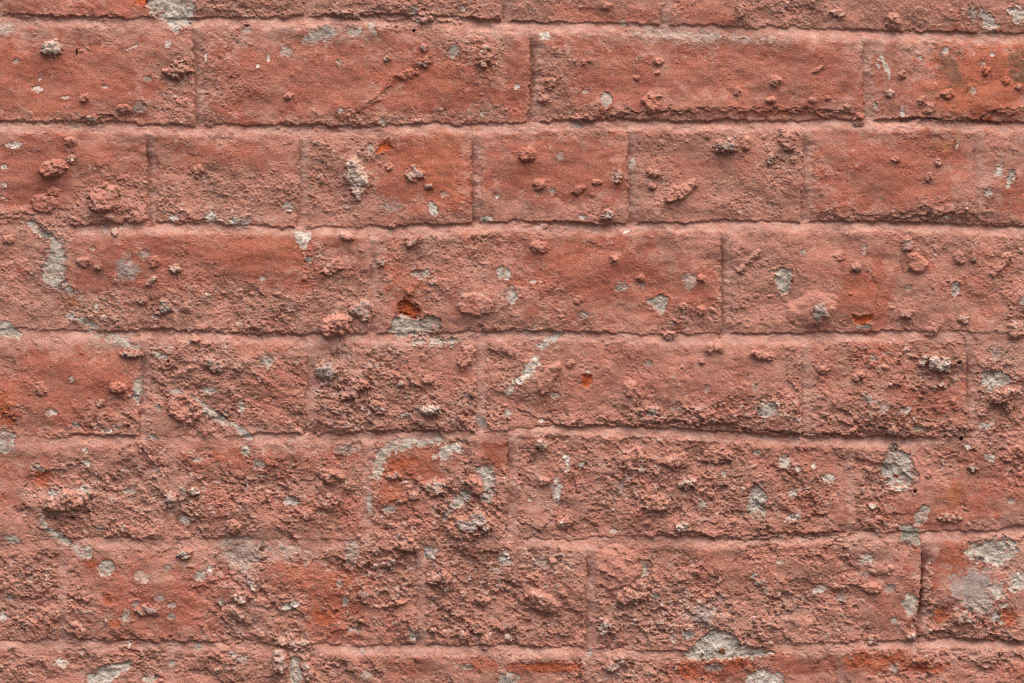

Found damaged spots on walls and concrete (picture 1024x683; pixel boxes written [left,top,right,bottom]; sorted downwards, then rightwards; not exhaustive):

spalling [20,218,79,297]
spalling [387,297,465,348]
spalling [880,443,920,486]
spalling [668,627,788,683]